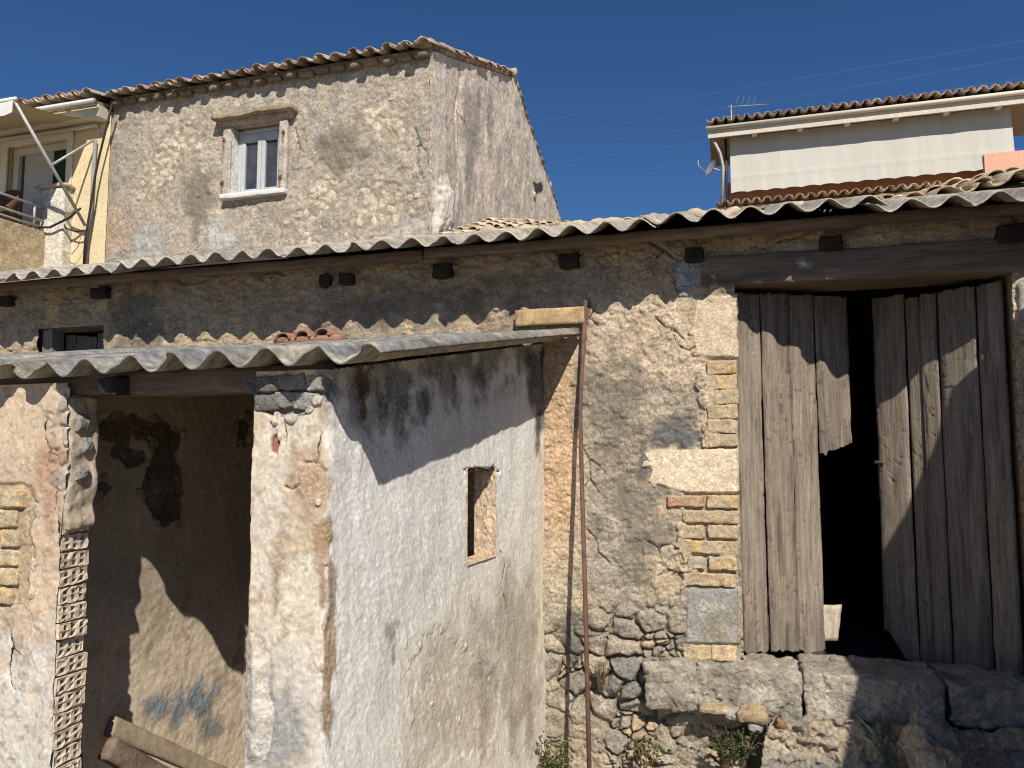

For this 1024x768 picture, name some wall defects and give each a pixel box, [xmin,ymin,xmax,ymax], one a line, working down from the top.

flaking render [95,411,187,530]
spalling [236,379,336,453]
leakage [517,343,544,453]
spalling [0,482,40,606]